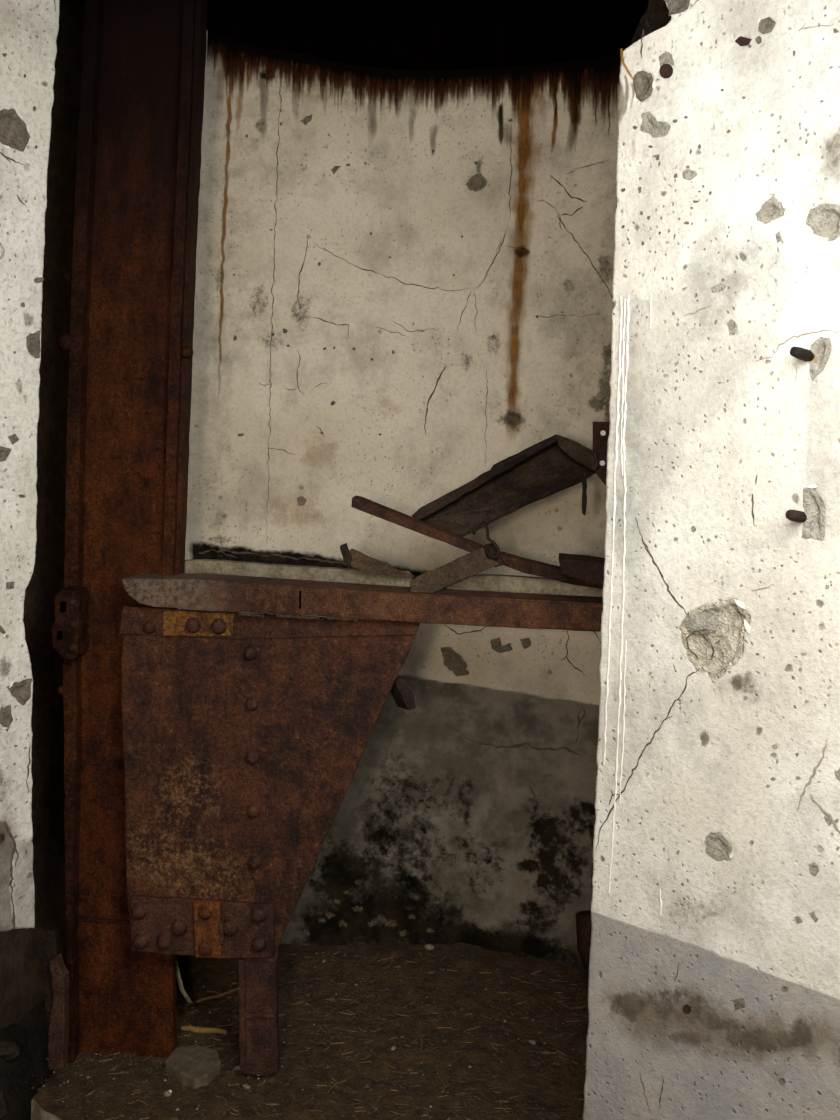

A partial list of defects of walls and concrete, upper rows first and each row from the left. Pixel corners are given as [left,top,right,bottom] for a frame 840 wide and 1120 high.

spalling [664,0,690,16]
spalling [0,108,38,152]
crack [261,73,526,546]
rust [207,30,640,428]
crack [538,159,613,318]
spalling [806,203,840,241]
crack [595,518,736,850]
spalling [679,598,751,683]
damp [301,756,595,958]